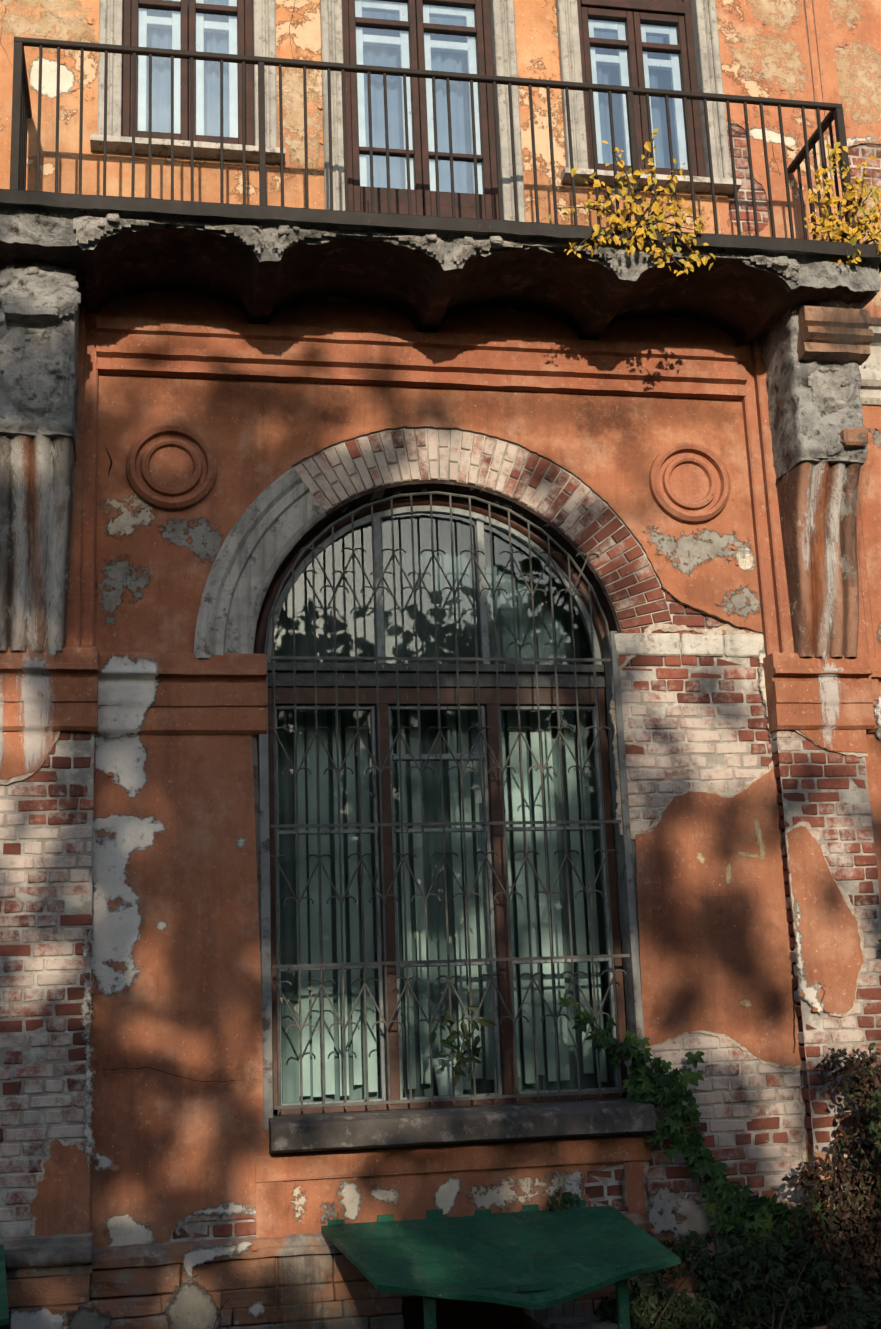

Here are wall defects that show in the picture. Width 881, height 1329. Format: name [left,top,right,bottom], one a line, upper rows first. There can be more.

peeling [728,0,808,98]
peeling [829,0,881,244]
spalling [727,124,798,232]
peeling [872,272,881,308]
peeling [95,493,223,634]
spalling [287,427,881,1242]
spalling [0,654,170,1237]
spalling [100,1200,258,1285]
peeling [11,1307,70,1329]